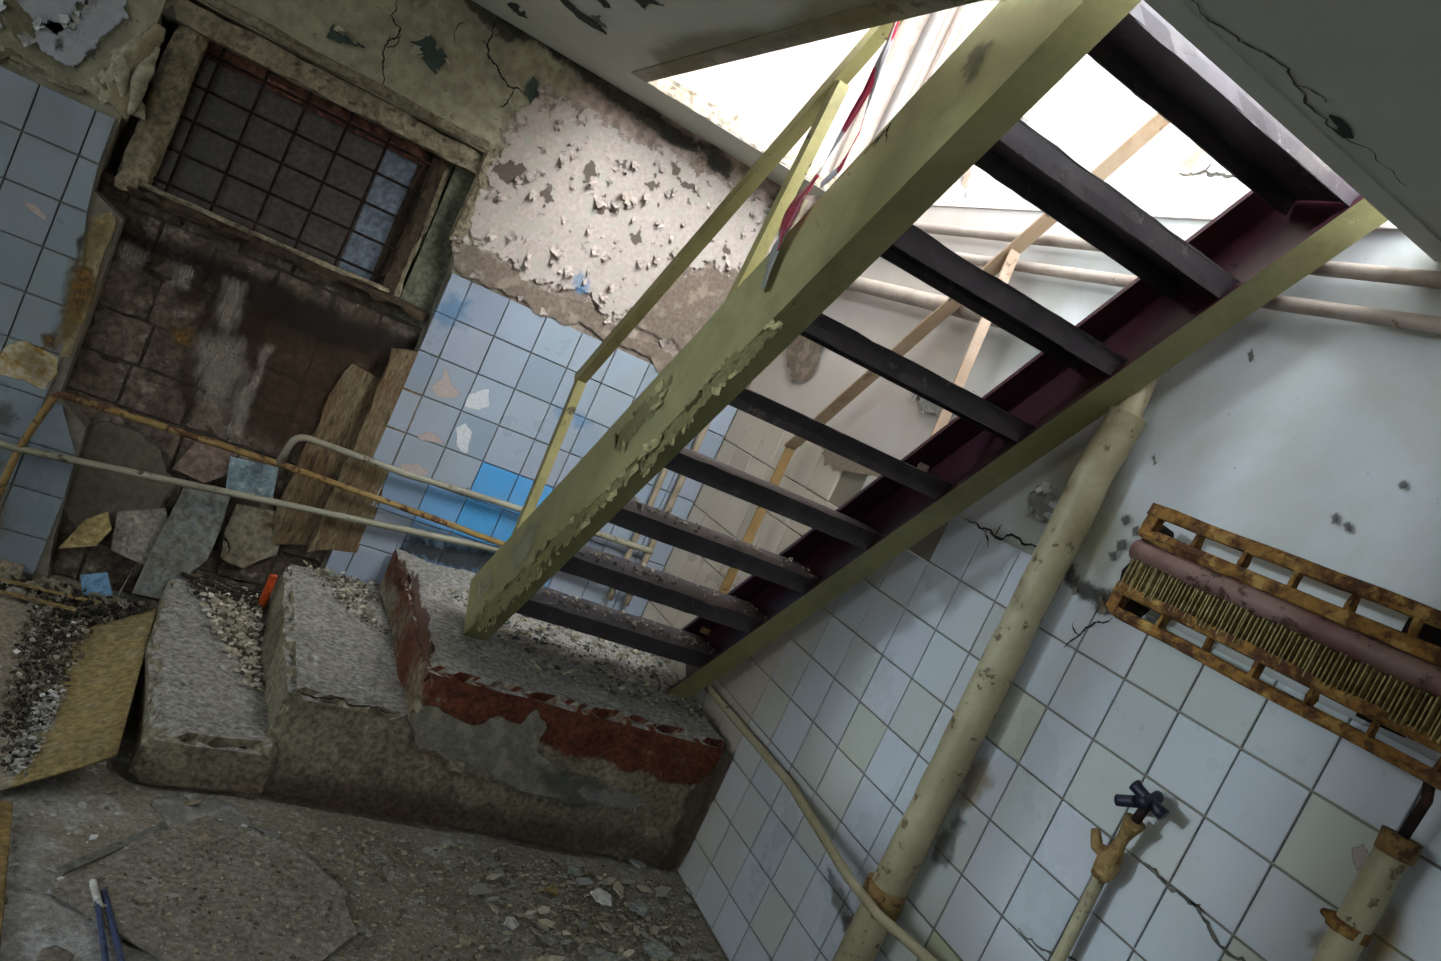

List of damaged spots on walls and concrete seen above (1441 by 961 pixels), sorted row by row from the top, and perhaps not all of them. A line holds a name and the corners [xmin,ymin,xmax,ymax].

peeling [0,0,129,71]
crack [382,0,402,85]
crack [454,22,531,107]
peeling [1021,96,1045,123]
crack [1191,0,1408,187]
peeling [451,76,788,632]
spalling [64,421,175,531]
spalling [226,456,278,498]
crack [966,518,1037,548]
crack [1064,617,1113,647]
spalling [409,700,641,811]
crack [1144,862,1246,961]